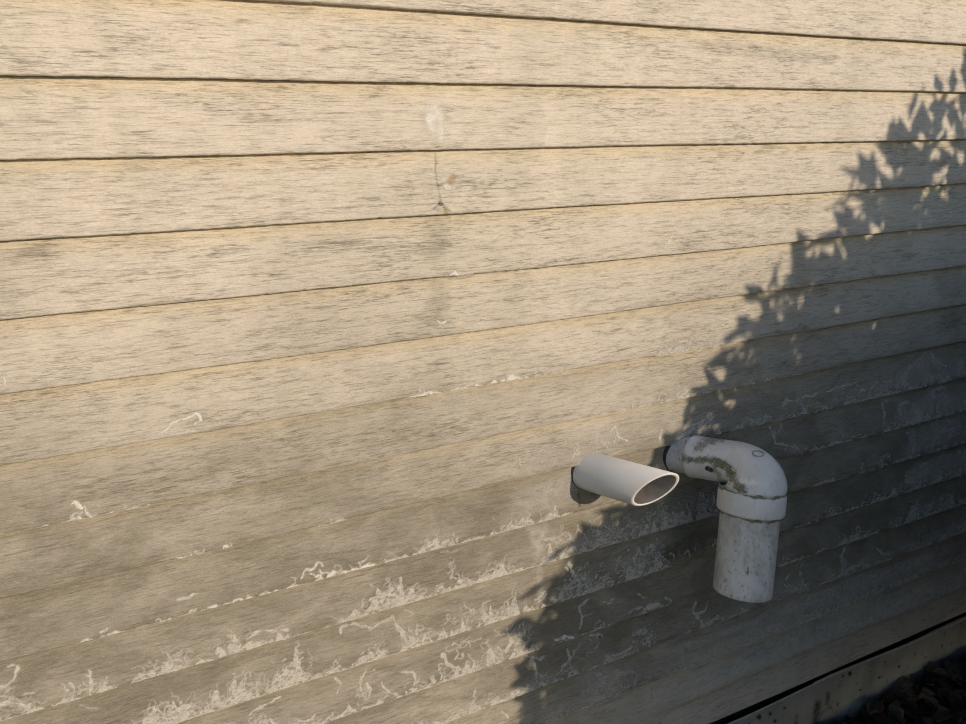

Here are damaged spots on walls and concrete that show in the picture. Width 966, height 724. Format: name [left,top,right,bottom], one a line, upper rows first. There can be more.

crack [439,177,456,213]